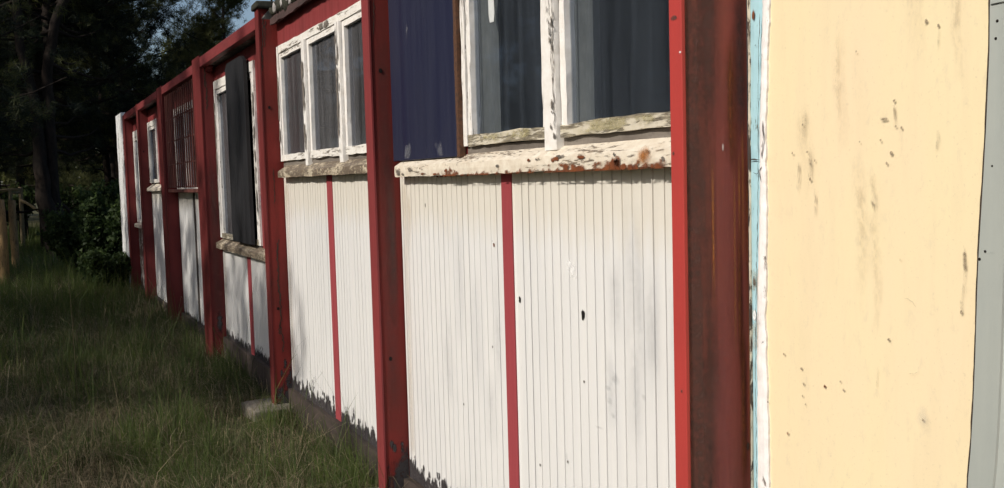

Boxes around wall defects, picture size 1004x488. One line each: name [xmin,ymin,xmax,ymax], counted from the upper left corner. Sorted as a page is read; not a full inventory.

rust [685,0,722,488]
rust [728,7,751,471]